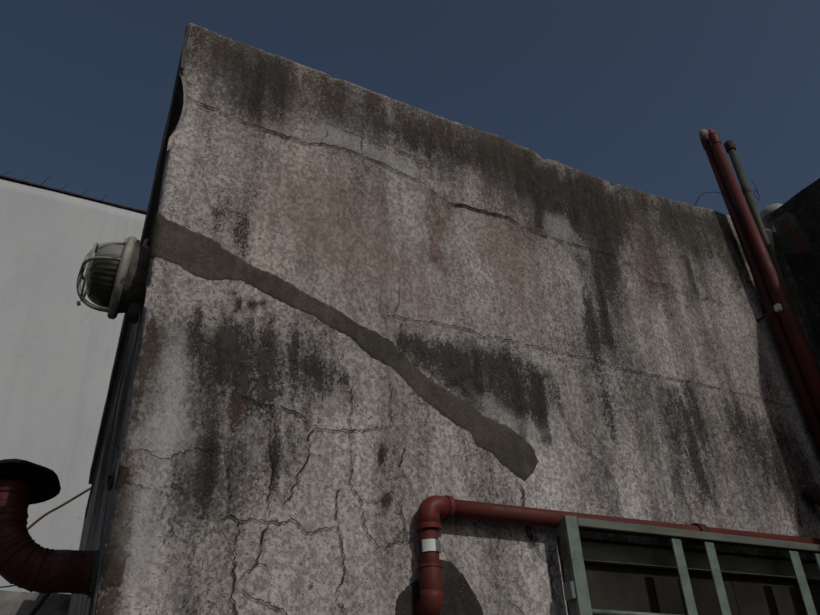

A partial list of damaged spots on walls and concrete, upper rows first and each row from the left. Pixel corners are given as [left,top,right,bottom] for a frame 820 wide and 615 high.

leakage [173,76,183,131]
crack [175,100,724,304]
leakage [185,24,771,444]
crack [117,381,420,615]
leakage [377,445,387,466]
crack [517,480,561,608]